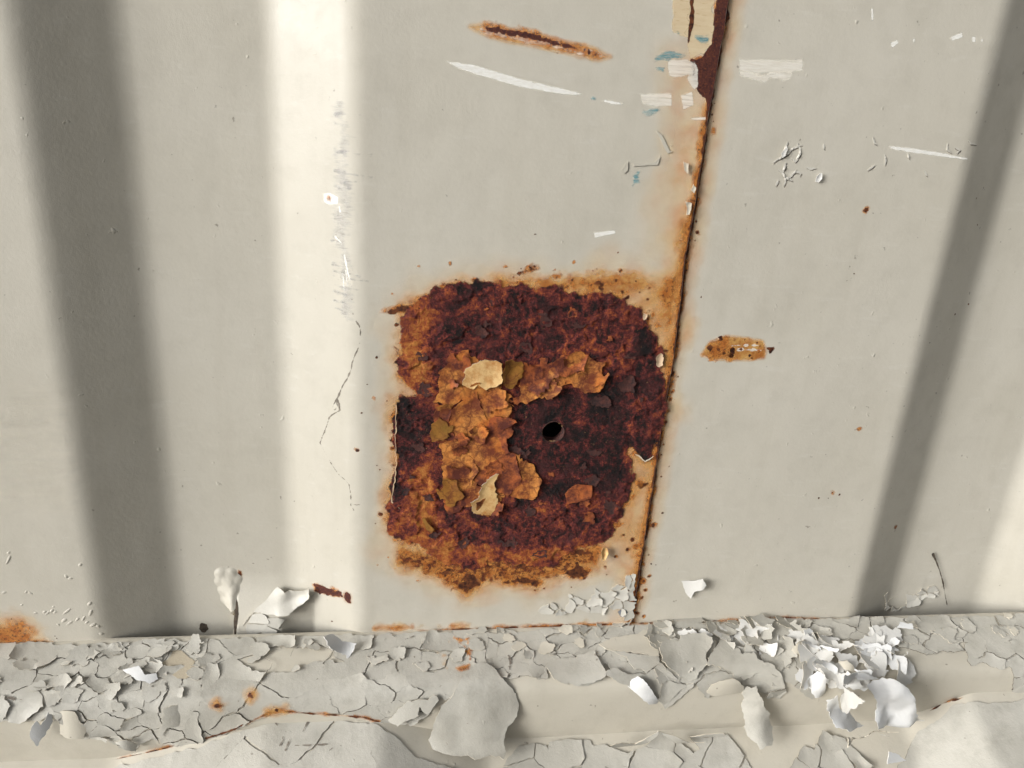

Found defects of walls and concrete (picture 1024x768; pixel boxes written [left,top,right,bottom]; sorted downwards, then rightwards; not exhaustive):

peeling [672,0,714,59]
corrosion [366,0,737,625]
corrosion [700,335,775,362]
crack [320,321,361,511]
corrosion [312,583,351,603]
corrosion [0,618,57,643]
corrosion [372,622,612,671]
peeling [0,574,1024,768]